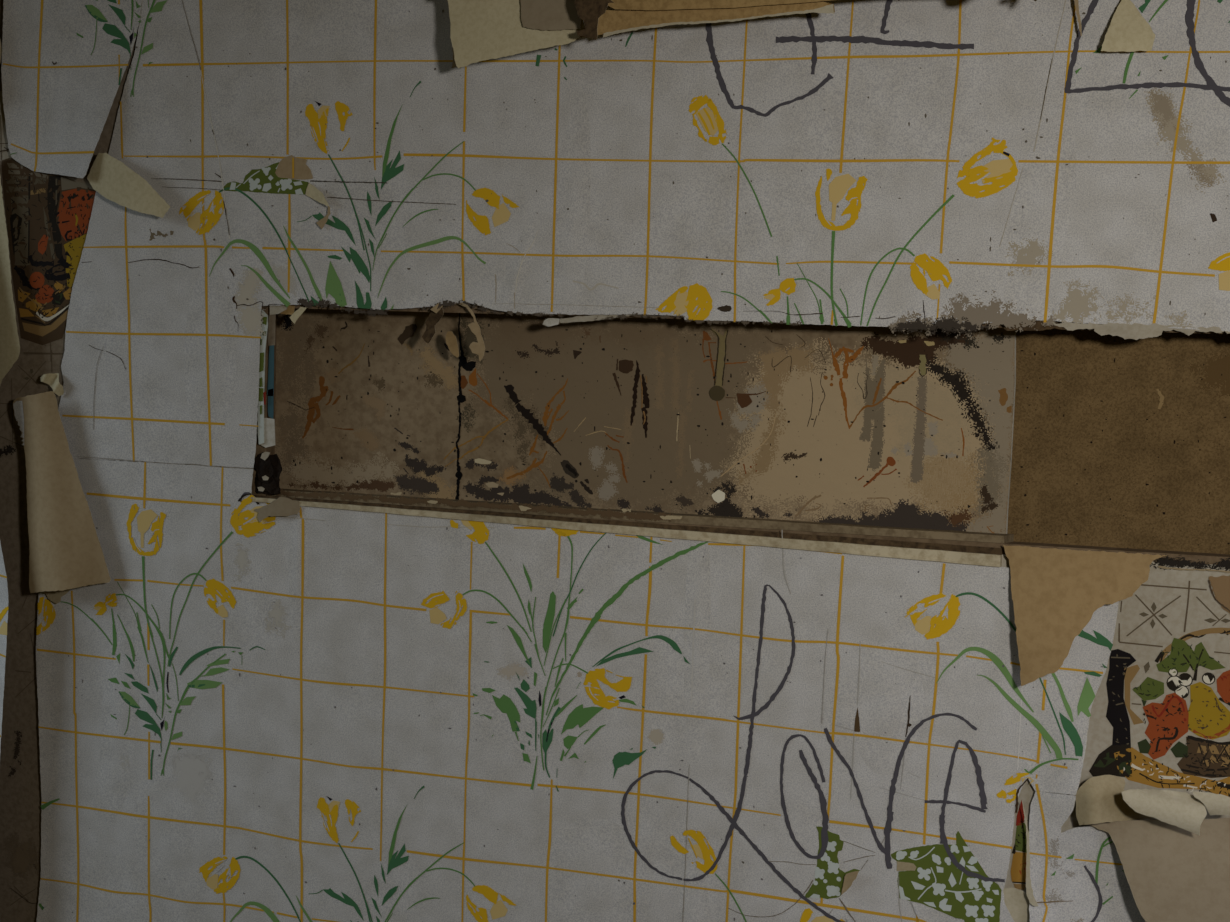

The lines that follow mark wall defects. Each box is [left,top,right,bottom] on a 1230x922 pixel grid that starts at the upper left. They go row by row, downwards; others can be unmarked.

spalling [398,324,417,345]
spalling [459,355,476,371]
spalling [612,359,650,438]
spalling [726,391,766,408]
spalling [504,385,579,479]
spalling [712,490,725,503]
spalling [1209,575,1230,613]